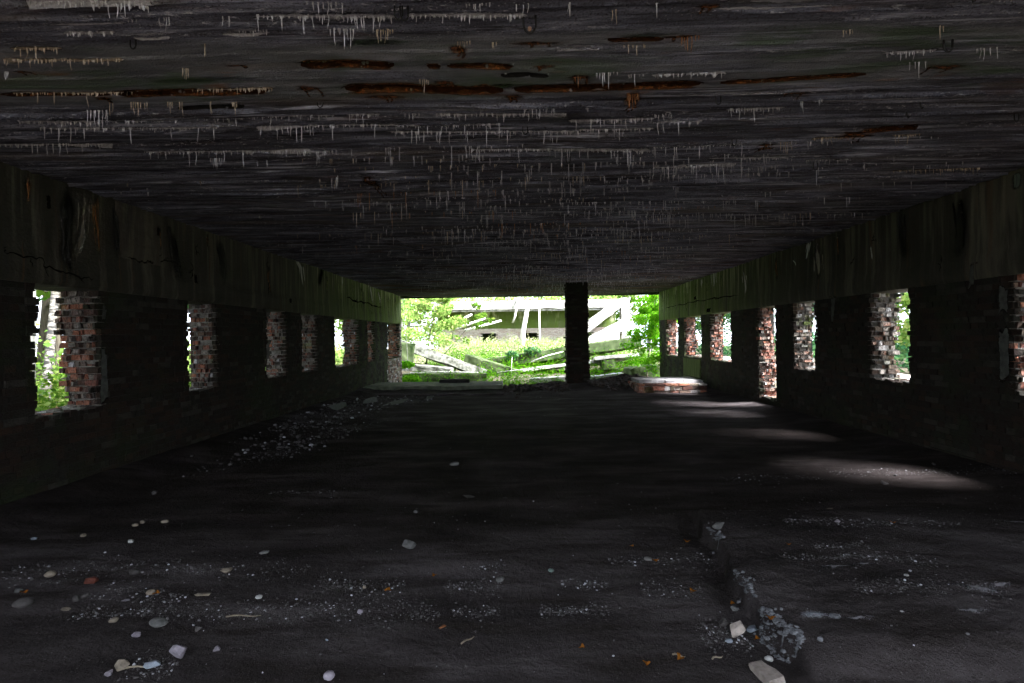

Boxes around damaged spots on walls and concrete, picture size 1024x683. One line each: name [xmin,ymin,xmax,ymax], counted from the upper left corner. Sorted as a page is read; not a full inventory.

damp [718,0,831,10]
efflorescence [3,0,156,65]
efflorescence [223,14,395,37]
efflorescence [409,13,527,22]
efflorescence [0,108,852,169]